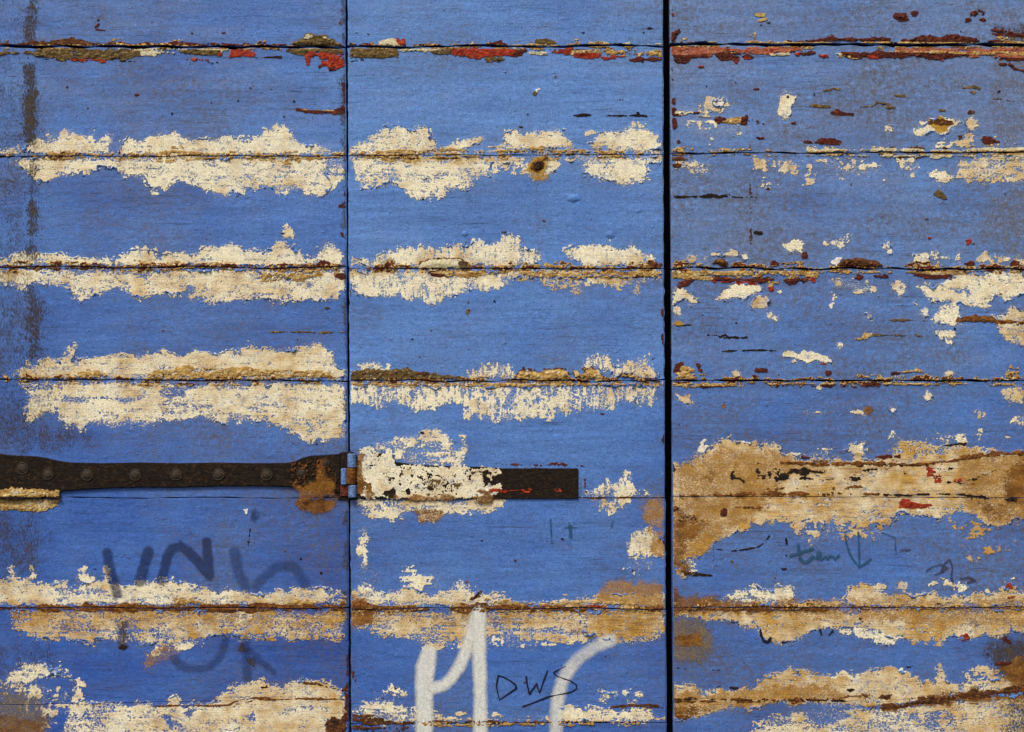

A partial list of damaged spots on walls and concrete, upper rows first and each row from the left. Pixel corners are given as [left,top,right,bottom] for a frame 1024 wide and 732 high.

peeling [0,9,1024,80]
peeling [0,85,1024,244]
corrosion [526,156,549,191]
peeling [0,223,1024,347]
peeling [2,339,1024,445]
corrosion [285,458,347,524]
peeling [0,410,1024,657]
peeling [0,653,1024,732]